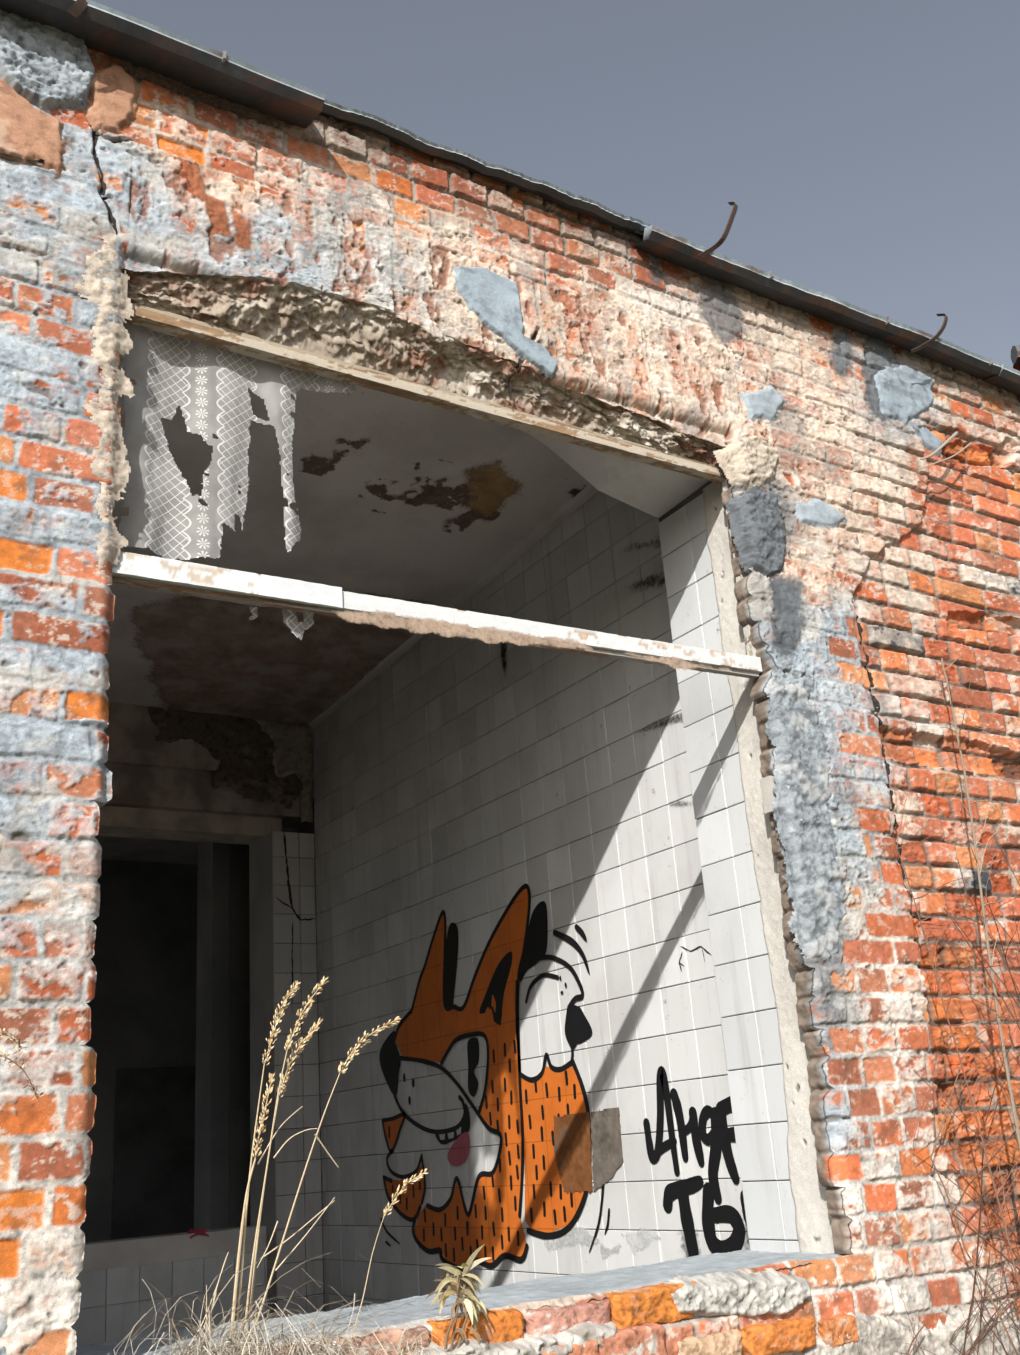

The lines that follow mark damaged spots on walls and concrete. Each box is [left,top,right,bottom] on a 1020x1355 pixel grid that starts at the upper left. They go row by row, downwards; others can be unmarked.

flaking render [0,9,141,179]
crack [0,153,63,168]
crack [89,123,129,235]
flaking render [453,266,558,380]
flaking render [874,364,1020,470]
flaking render [793,498,848,530]
peeling [337,610,592,650]
peeling [626,653,730,671]
flaking render [148,706,303,809]
spalling [335,1281,859,1355]